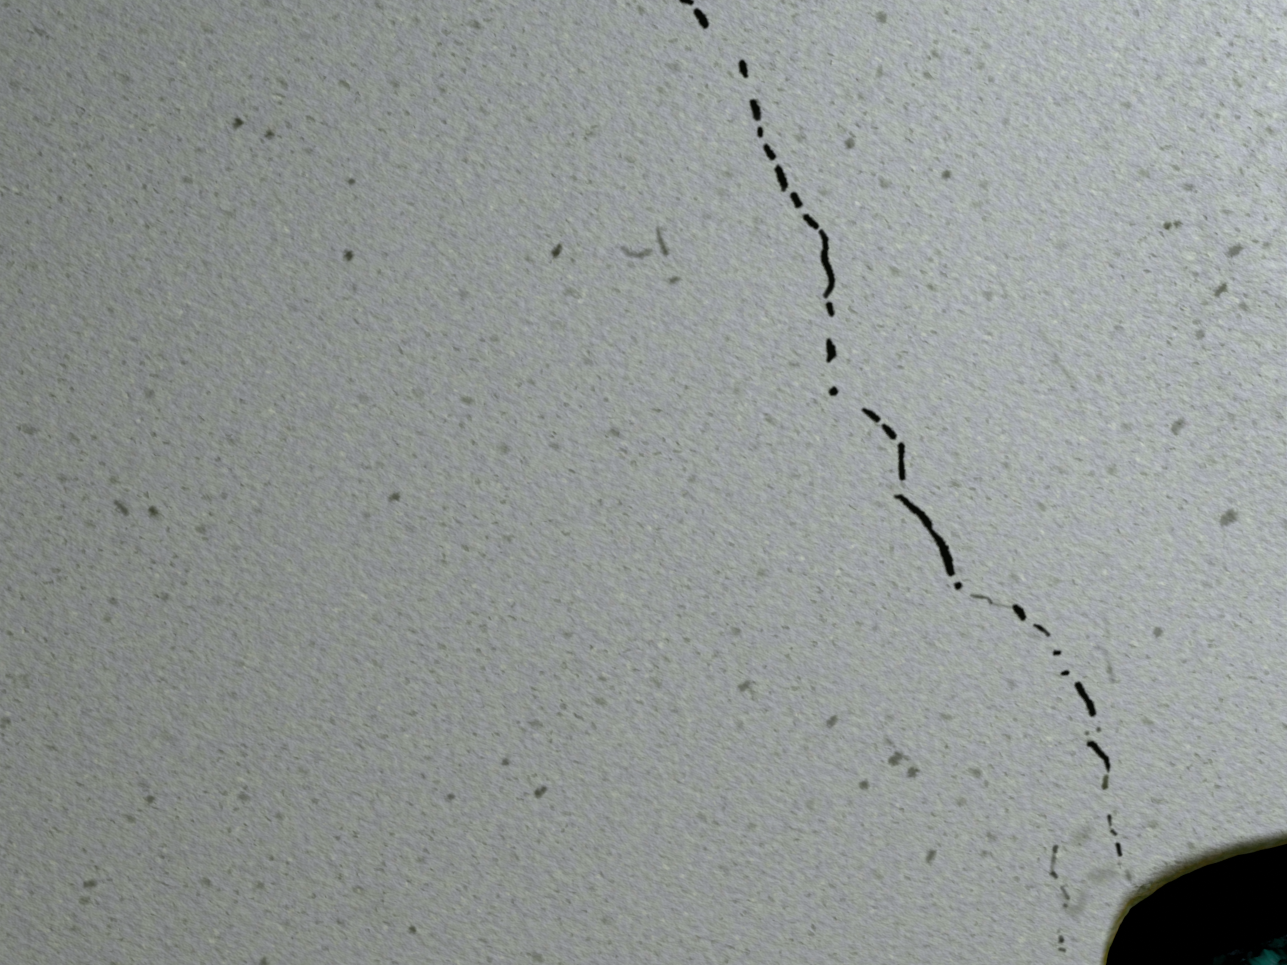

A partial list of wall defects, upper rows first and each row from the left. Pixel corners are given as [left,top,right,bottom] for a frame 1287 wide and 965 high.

crack [680,0,709,28]
crack [739,60,1123,856]